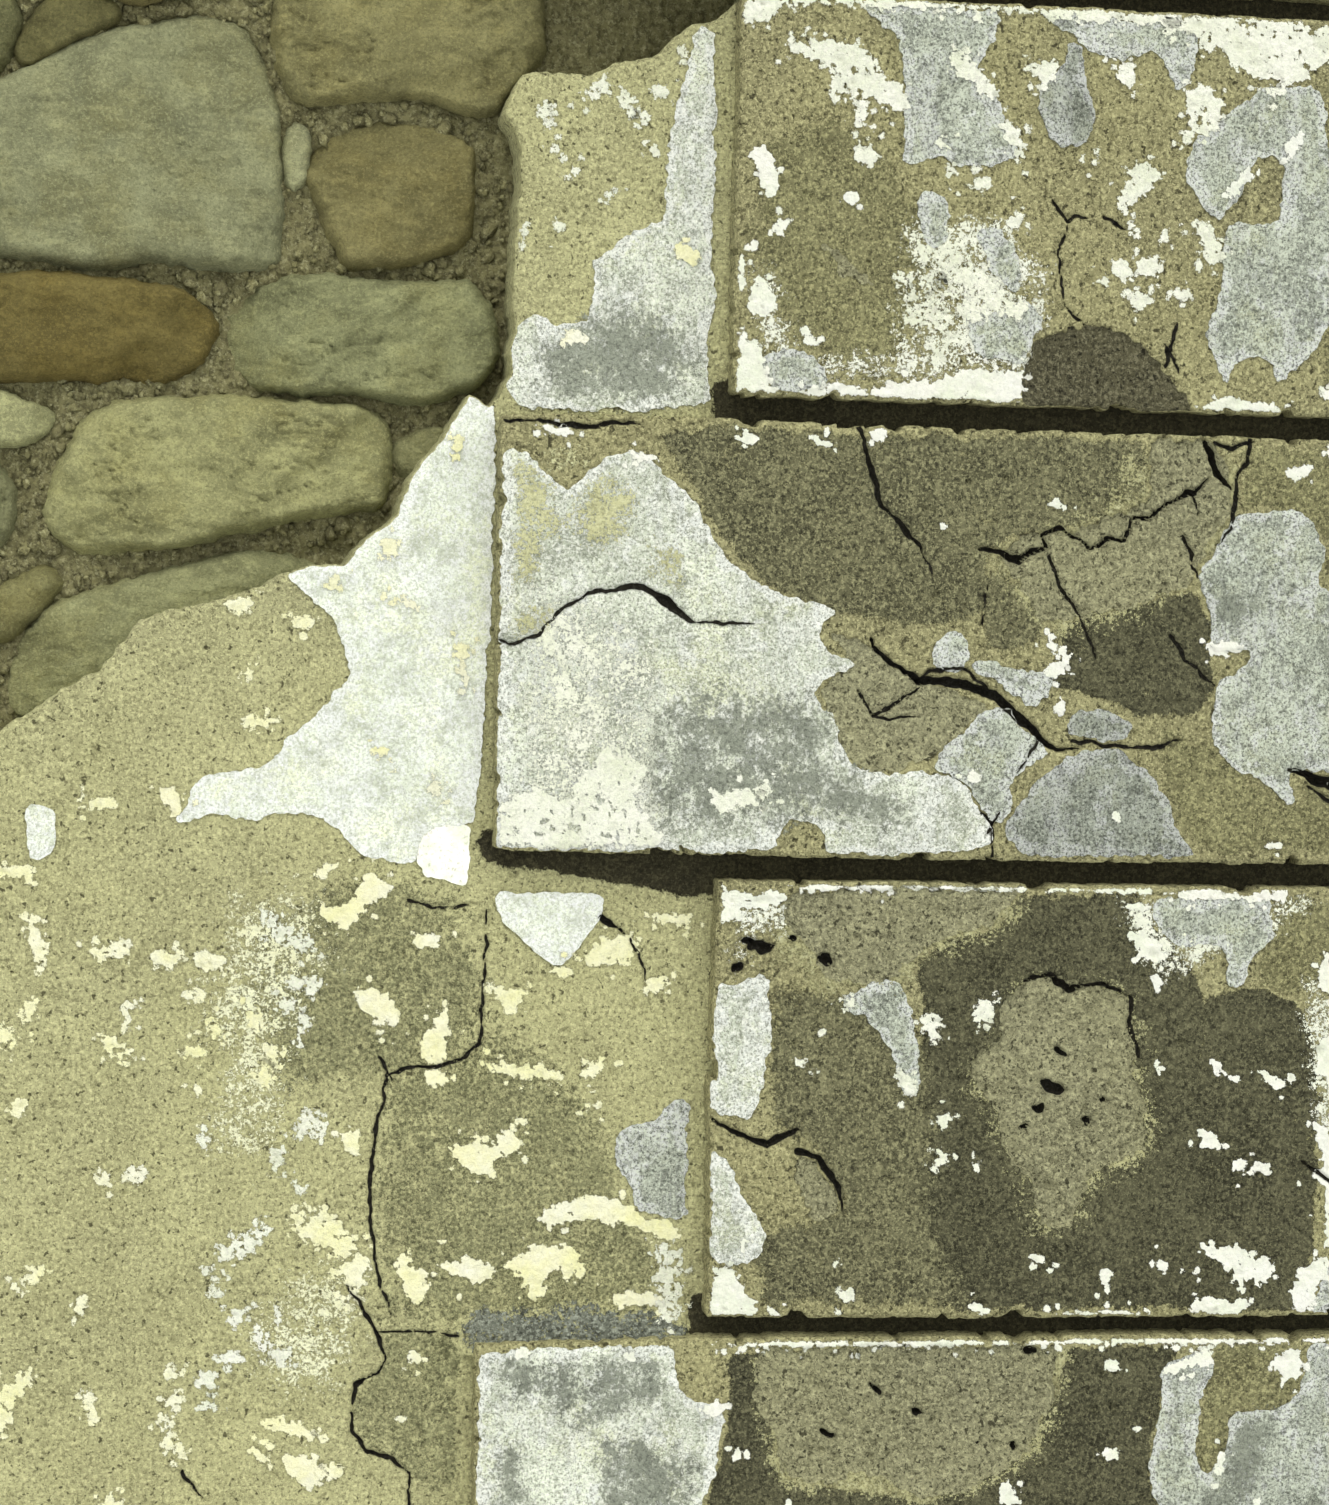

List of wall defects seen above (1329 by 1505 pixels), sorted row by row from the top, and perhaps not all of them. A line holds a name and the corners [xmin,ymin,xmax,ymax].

crack [503,418,636,429]
crack [498,583,755,646]
flaking render [76,0,1329,1123]
crack [857,638,1179,773]
crack [978,438,1254,657]
flaking render [0,804,56,887]
peeling [148,1106,373,1468]
crack [346,899,489,1505]
flaking render [393,1099,786,1505]
crack [711,1118,843,1210]
spalling [970,975,1166,1230]
peeling [1149,1116,1329,1315]